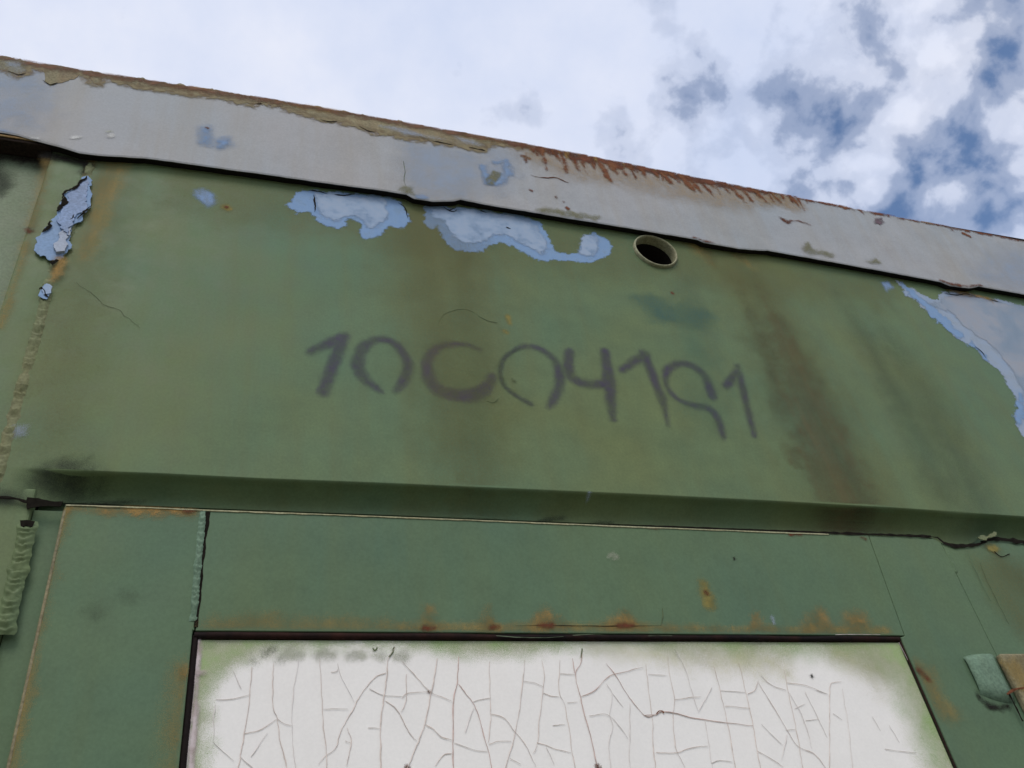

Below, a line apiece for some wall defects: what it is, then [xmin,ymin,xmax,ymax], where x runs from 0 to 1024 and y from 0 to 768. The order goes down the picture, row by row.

corrosion [91,72,1023,242]
peeling [34,176,93,261]
peeling [285,186,613,263]
damp [144,164,907,521]
peeling [882,280,1024,437]
corrosion [196,577,891,635]
crack [213,647,853,768]